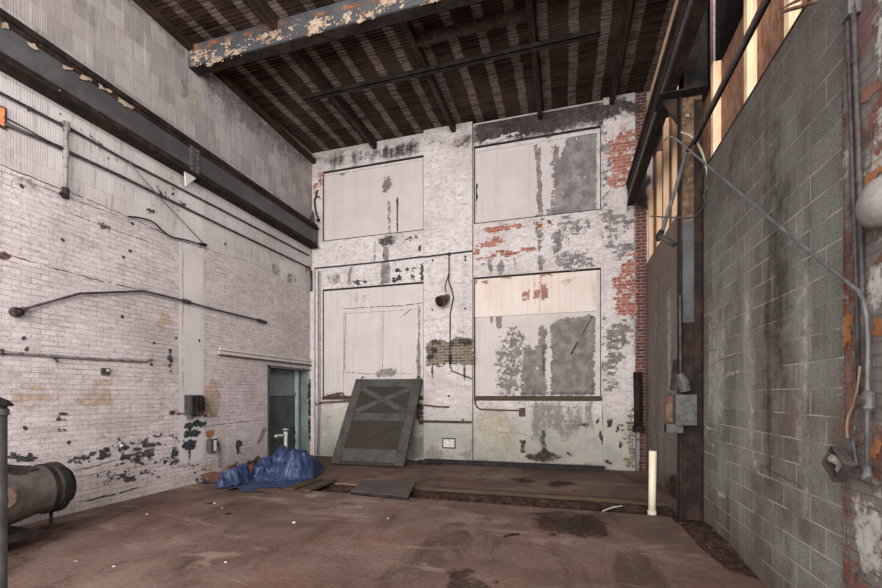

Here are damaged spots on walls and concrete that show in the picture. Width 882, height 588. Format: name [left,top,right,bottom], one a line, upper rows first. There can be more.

peeling [188,0,407,67]
peeling [63,65,134,110]
peeling [464,121,640,396]
spalling [425,336,475,368]
damp [706,308,739,430]
damp [740,295,769,475]
damp [797,275,809,401]
peeling [8,452,38,462]
peeling [67,433,206,485]
damp [478,402,593,462]